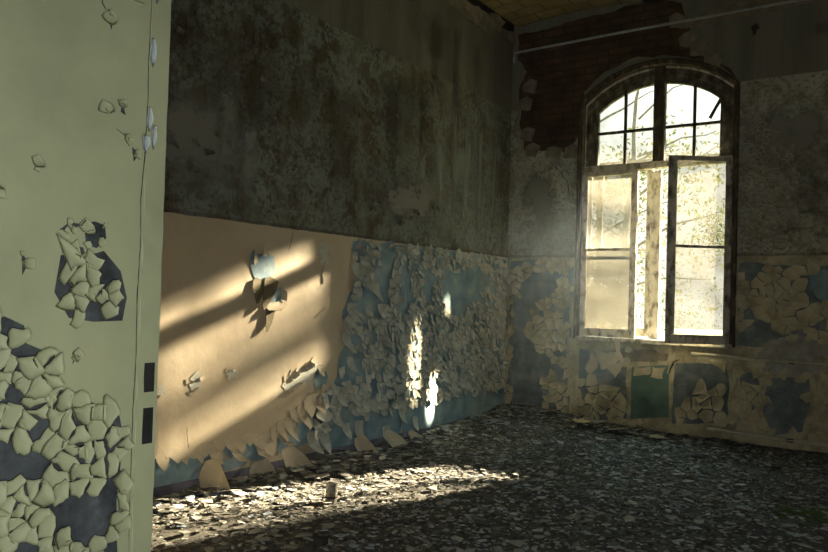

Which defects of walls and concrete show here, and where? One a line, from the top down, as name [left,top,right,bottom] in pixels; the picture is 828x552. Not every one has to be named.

damp [166,91,234,170]
flaking render [518,0,736,159]
peeling [0,313,135,552]
peeling [54,217,127,329]
peeling [154,238,814,488]
peeling [735,257,828,347]